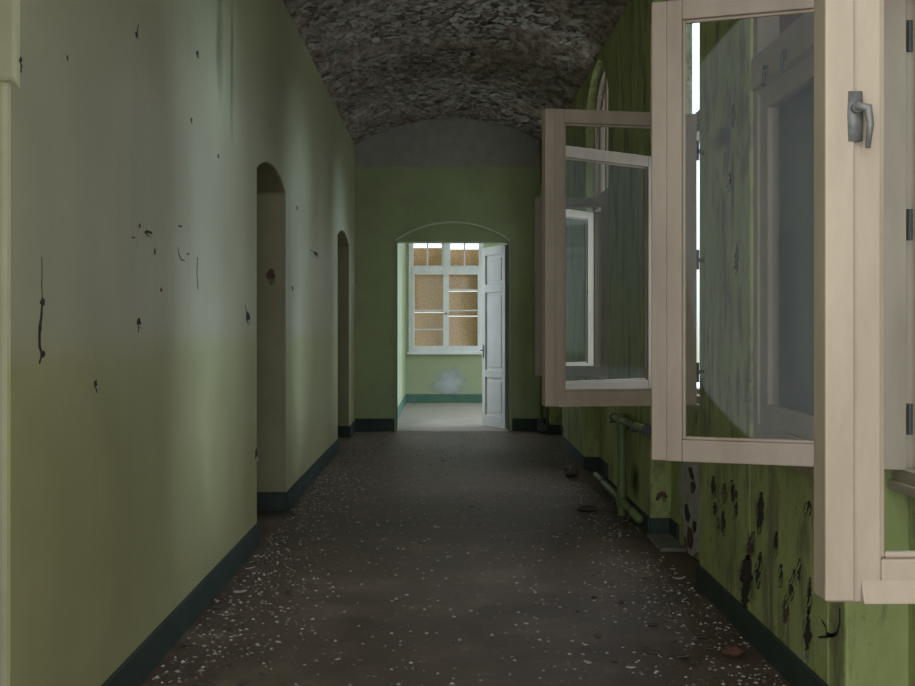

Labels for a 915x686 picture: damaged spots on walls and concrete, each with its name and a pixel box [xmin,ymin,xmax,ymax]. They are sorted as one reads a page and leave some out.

crack [37,257,45,364]
flaking render [436,370,462,394]